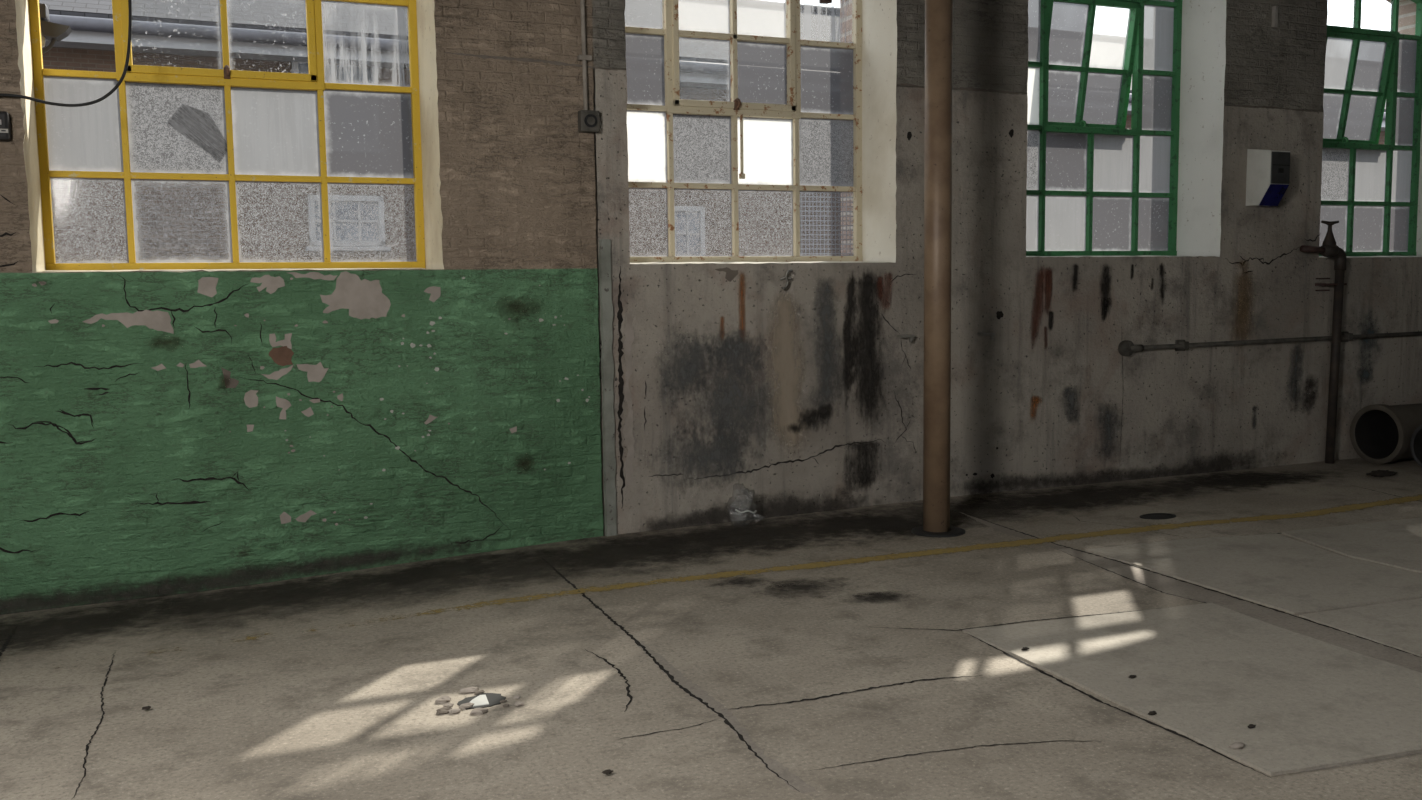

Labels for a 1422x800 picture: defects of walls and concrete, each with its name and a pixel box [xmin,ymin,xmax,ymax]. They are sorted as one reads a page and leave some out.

crack [0,362,138,445]
peeling [83,310,174,334]
peeling [197,277,218,297]
peeling [151,313,343,453]
crack [117,274,512,544]
peeling [250,271,405,323]
damp [664,332,761,485]
damp [790,273,884,432]
rust [1032,269,1052,348]
damp [648,442,878,531]
damp [0,543,469,615]
crack [73,655,115,798]